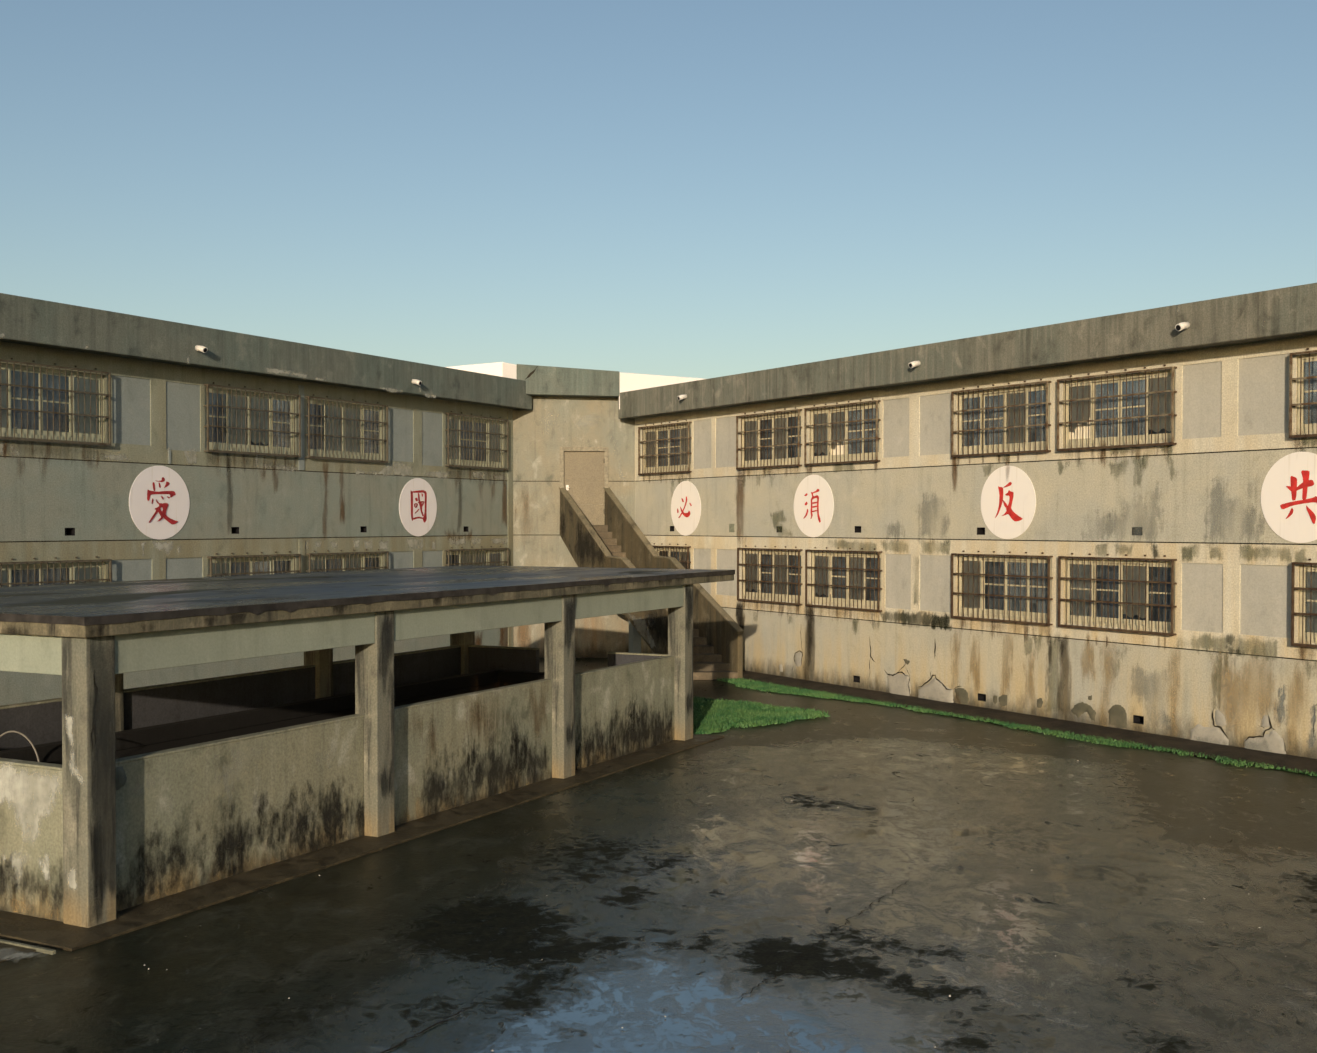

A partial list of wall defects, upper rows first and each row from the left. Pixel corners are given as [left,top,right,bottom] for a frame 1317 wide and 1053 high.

peeling [885,659,911,696]
leakage [1048,638,1069,711]
peeling [1190,688,1288,754]
leakage [0,866,63,904]
leakage [91,783,365,921]
crack [380,1007,470,1053]